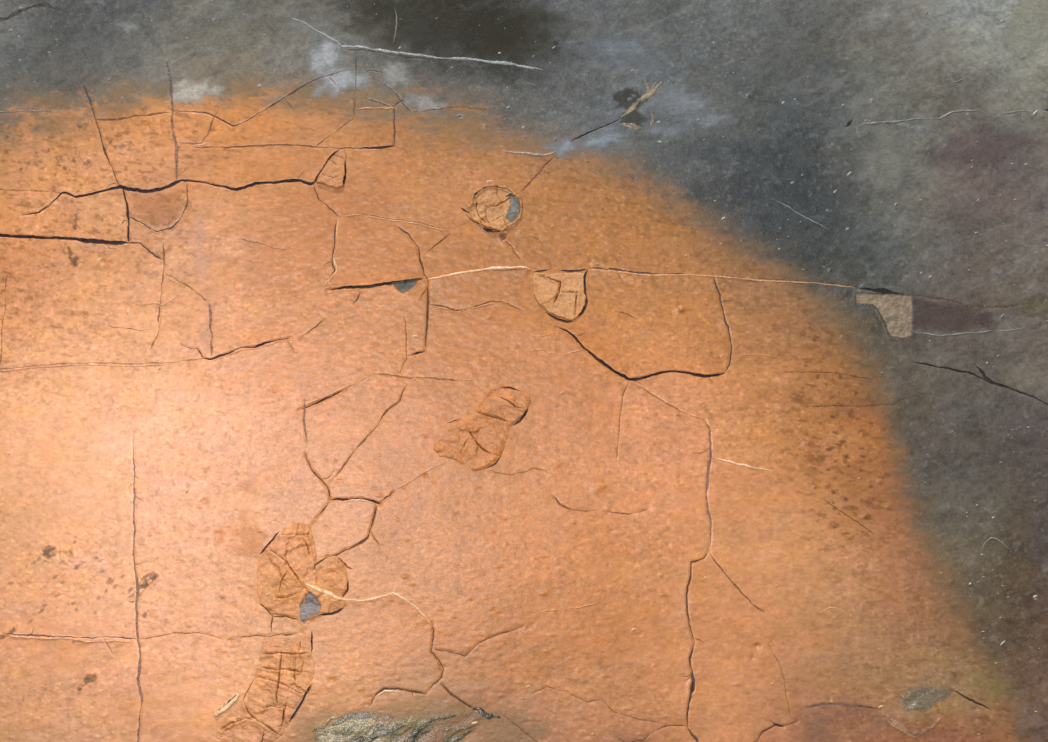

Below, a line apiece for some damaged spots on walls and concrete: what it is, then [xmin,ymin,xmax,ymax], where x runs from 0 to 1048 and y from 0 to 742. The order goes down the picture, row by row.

crack [845,109,1048,128]
crack [521,119,619,192]
peeling [533,269,588,323]
peeling [856,293,913,338]
crack [0,11,551,742]
crack [535,267,1048,742]
peeling [213,522,352,742]